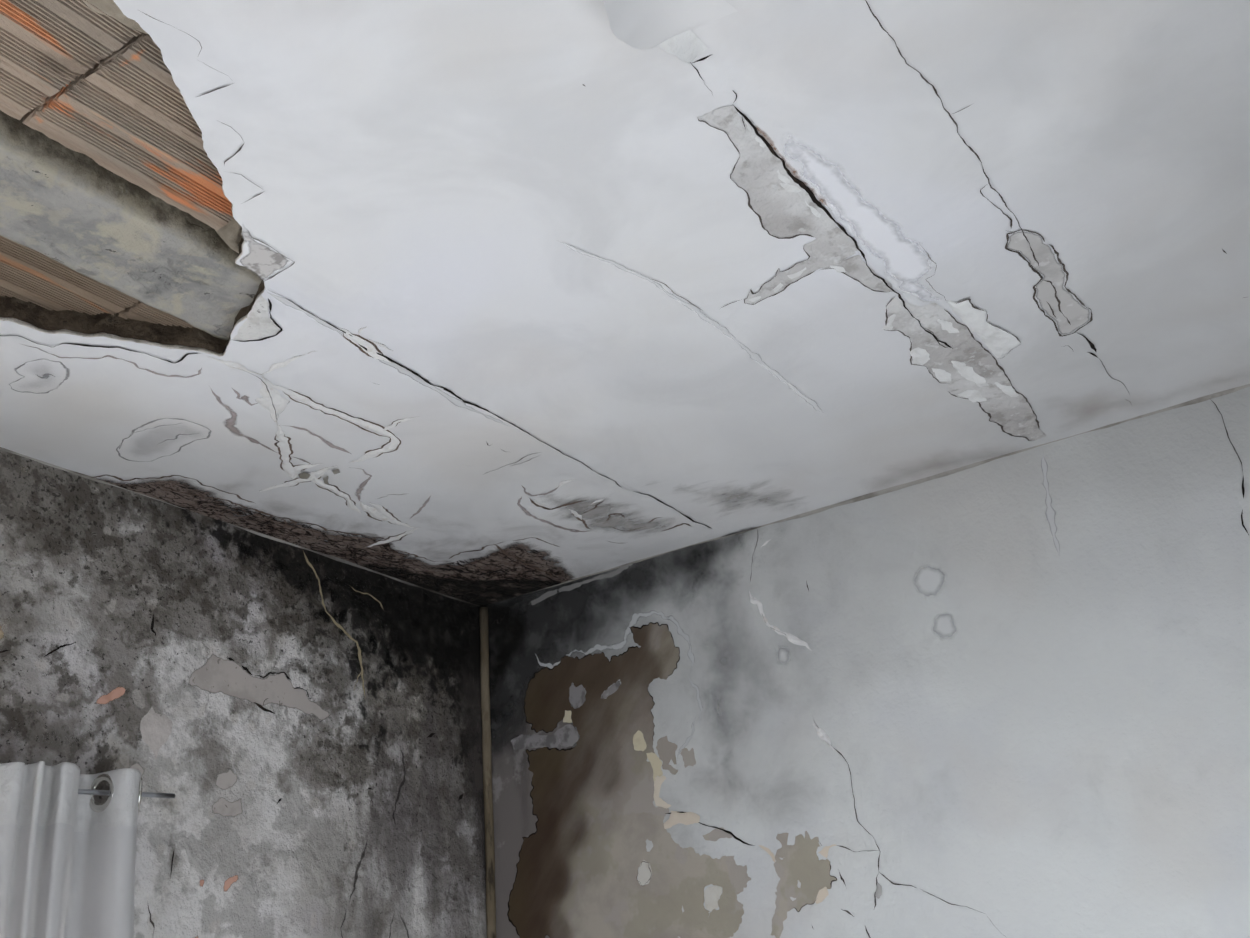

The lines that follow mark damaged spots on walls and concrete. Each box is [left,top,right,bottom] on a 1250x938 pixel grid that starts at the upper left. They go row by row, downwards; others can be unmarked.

crack [865,0,1043,280]
crack [7,335,198,363]
damp [11,343,202,394]
flaking render [0,169,287,357]
damp [211,388,277,453]
damp [284,425,371,501]
crack [249,233,712,529]
peeling [698,106,1046,441]
damp [75,472,754,938]
peeling [507,622,751,938]
crack [665,812,754,846]
peeling [759,831,847,938]